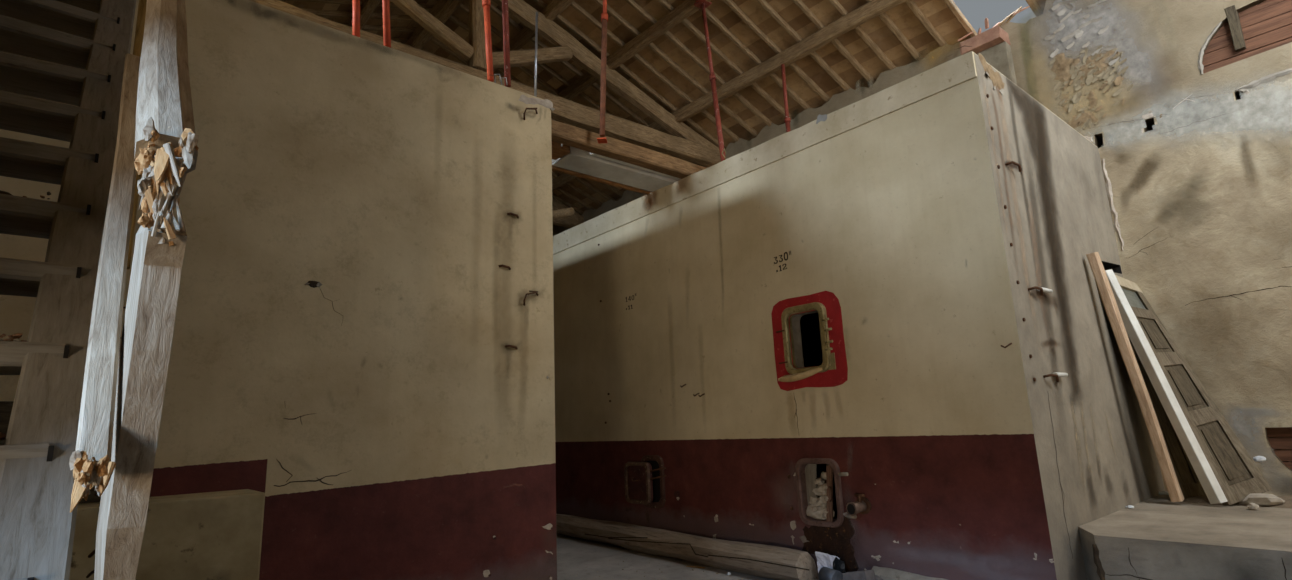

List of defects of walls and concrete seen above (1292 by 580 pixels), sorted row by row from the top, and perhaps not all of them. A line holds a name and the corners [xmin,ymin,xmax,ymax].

peeling [1045,0,1152,144]
crack [1185,258,1292,306]
crack [274,460,351,487]
crack [1048,395,1152,580]